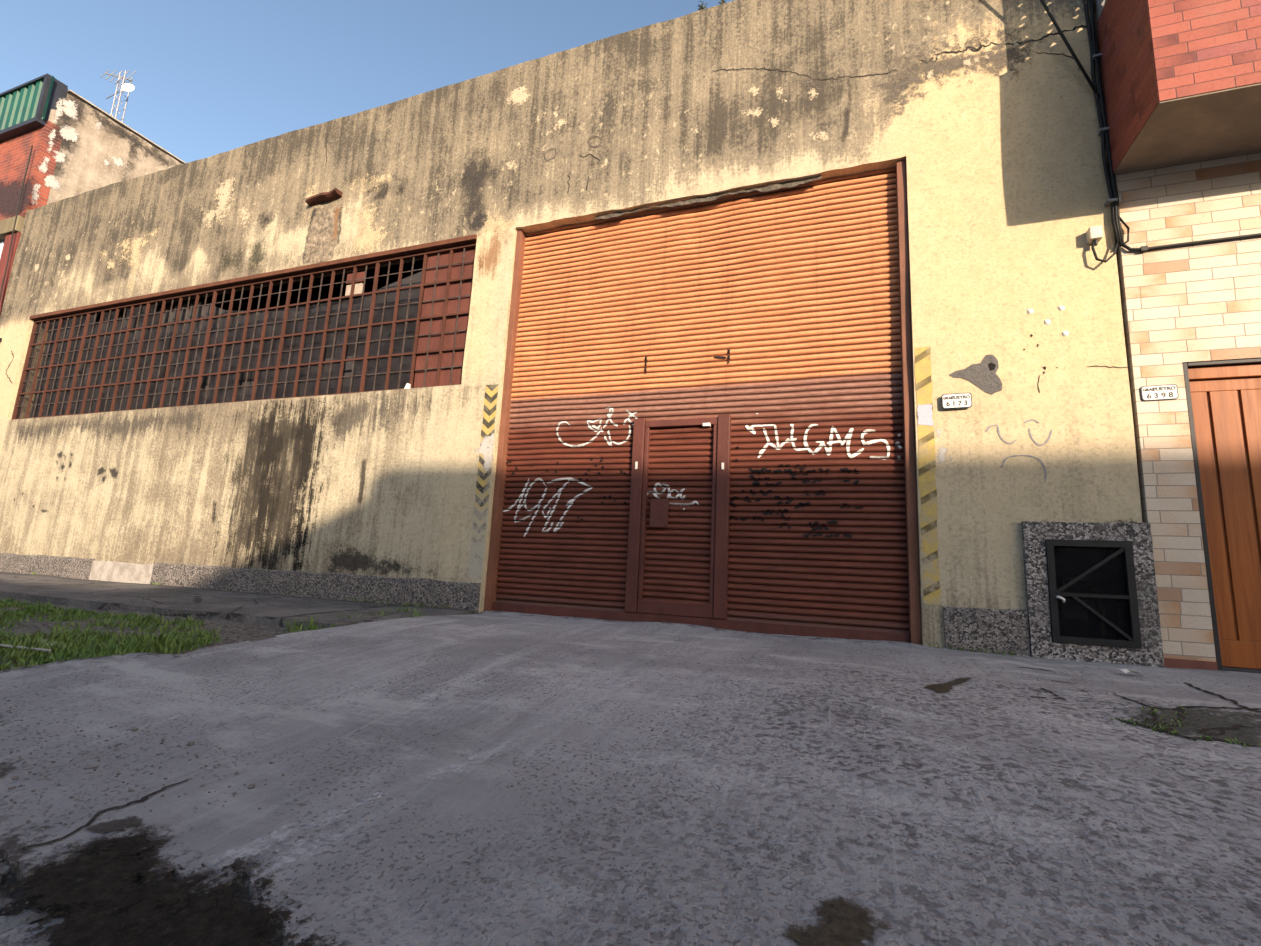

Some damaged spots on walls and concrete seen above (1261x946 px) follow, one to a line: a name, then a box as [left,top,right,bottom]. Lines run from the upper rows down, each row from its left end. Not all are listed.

crack [712,25,1087,81]
damp [841,84,851,141]
peeling [31,98,79,204]
damp [0,96,177,217]
damp [367,182,403,200]
damp [212,390,432,571]
damp [326,545,437,576]